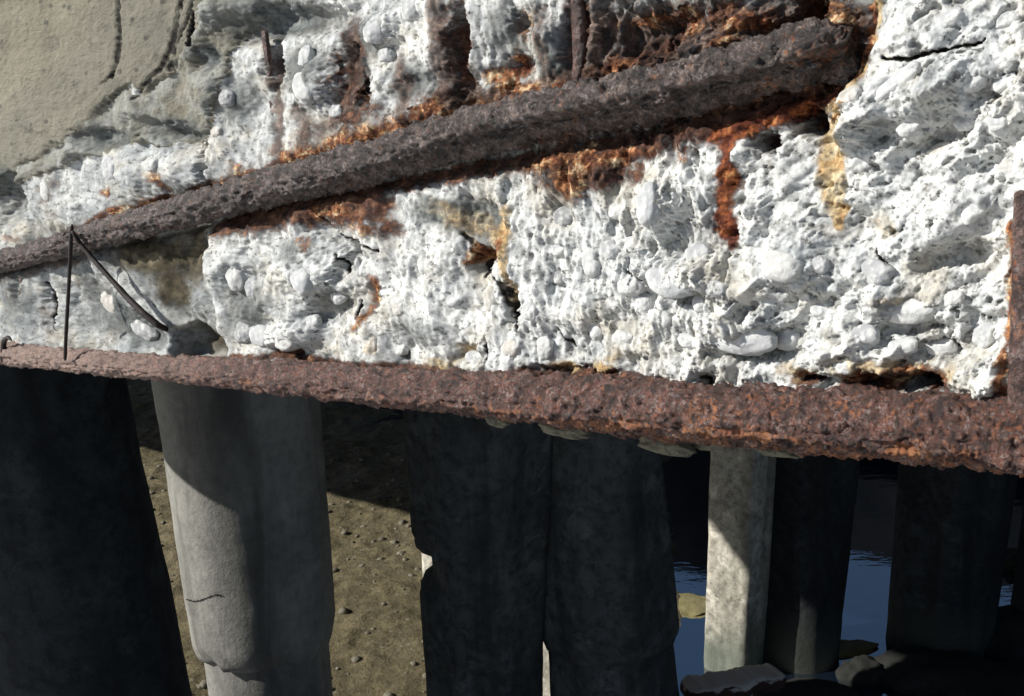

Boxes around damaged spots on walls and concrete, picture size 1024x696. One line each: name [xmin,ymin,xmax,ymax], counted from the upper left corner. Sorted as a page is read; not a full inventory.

crack [881,37,986,62]
corrosion [74,0,882,250]
spalling [0,0,1024,400]
corrosion [441,206,519,294]
corrosion [0,256,89,284]
crack [462,231,521,333]
corrosion [229,349,455,371]
corrosion [513,354,619,376]
corrosion [786,364,828,386]
corrosion [838,360,953,392]